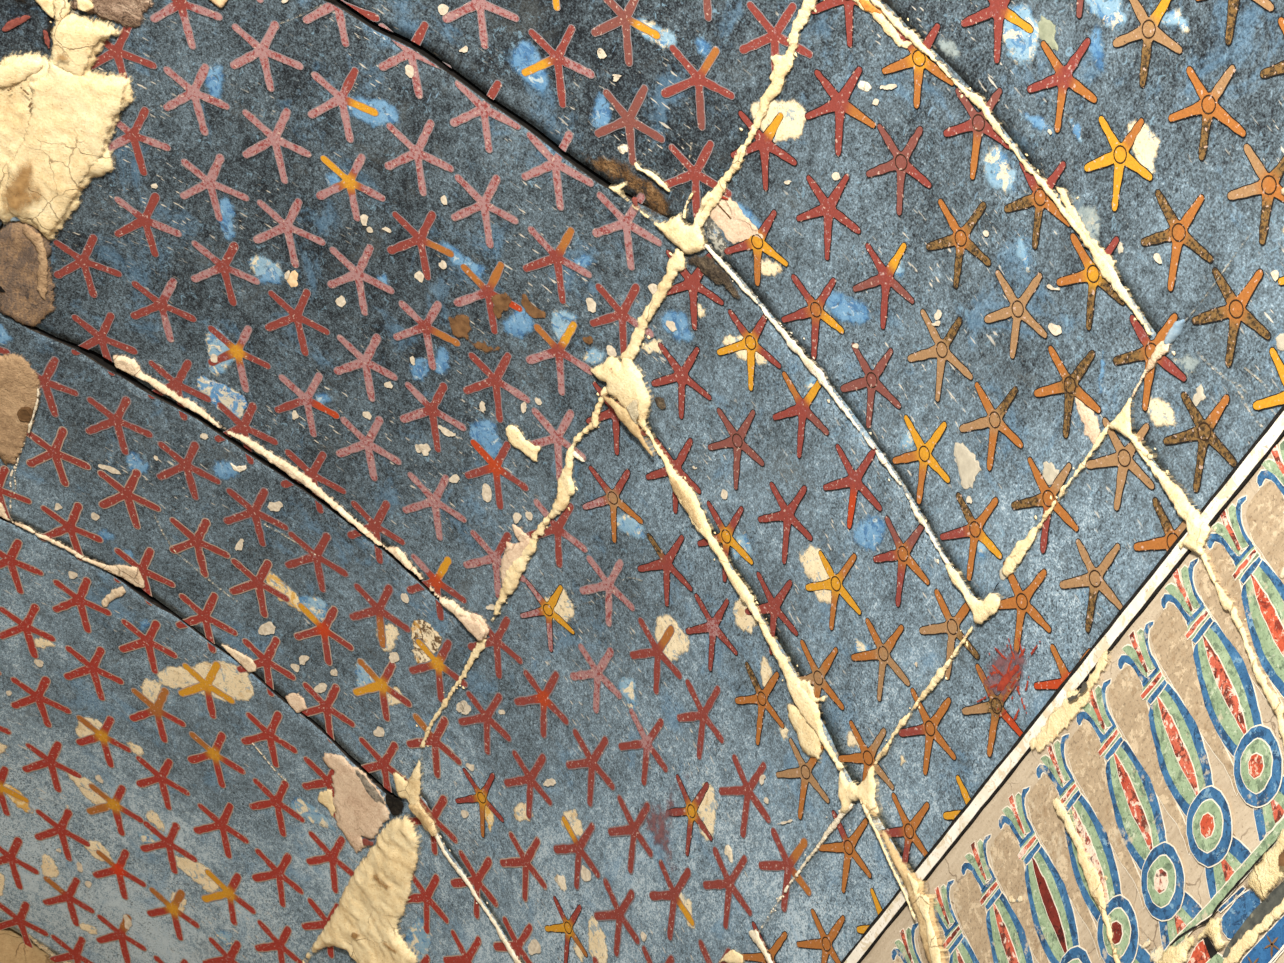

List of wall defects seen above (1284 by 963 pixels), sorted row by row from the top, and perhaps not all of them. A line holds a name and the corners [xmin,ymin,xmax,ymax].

spalling [0,217,55,465]
crack [24,324,439,599]
crack [326,0,1185,771]
spalling [0,503,145,607]
peeling [140,645,256,703]
crack [0,443,398,798]
spalling [285,693,307,713]
crack [1002,425,1284,746]
spalling [290,753,404,853]
crack [435,833,521,963]
crack [719,799,947,963]
spalling [1141,829,1284,963]